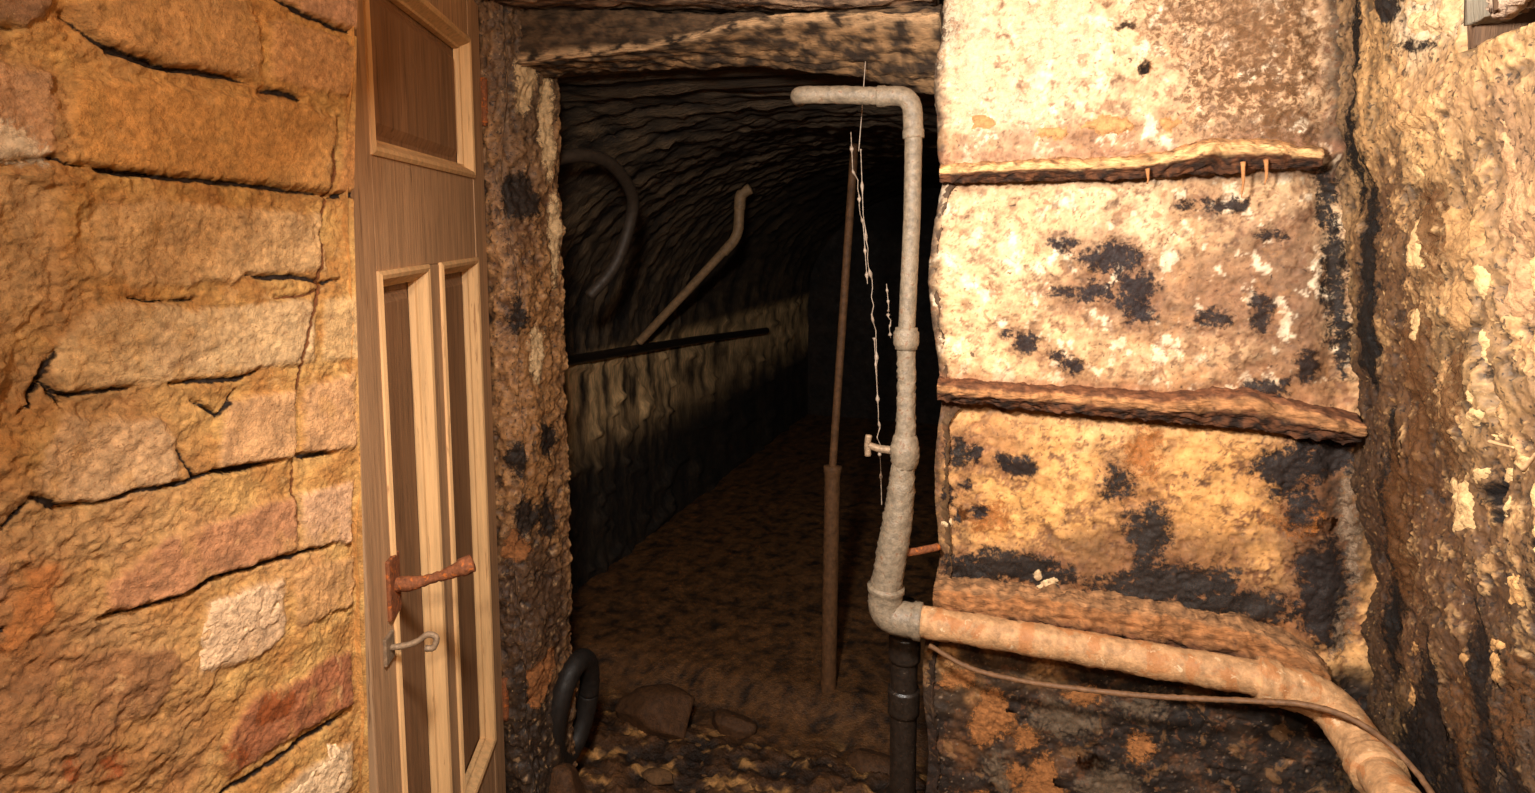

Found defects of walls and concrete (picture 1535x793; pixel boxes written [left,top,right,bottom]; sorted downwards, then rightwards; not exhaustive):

crack [274,0,347,33]
crack [57,16,299,102]
damp [939,0,1042,137]
damp [1173,195,1250,215]
damp [1047,237,1163,324]
damp [1193,291,1277,334]
damp [1001,329,1084,376]
crack [0,449,327,617]
damp [941,437,1363,659]
damp [1029,687,1166,738]
crack [220,714,341,793]
damp [1074,759,1141,793]